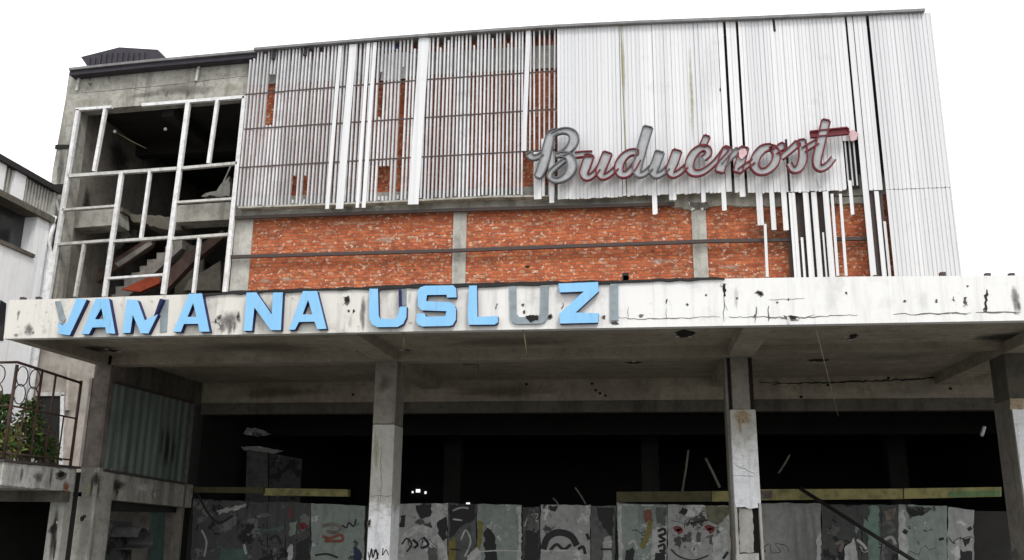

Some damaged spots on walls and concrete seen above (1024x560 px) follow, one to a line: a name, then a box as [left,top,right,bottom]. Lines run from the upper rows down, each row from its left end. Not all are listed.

crack [619,294,855,322]
crack [893,289,1019,315]
water stain [215,312,240,332]
crack [759,377,935,385]